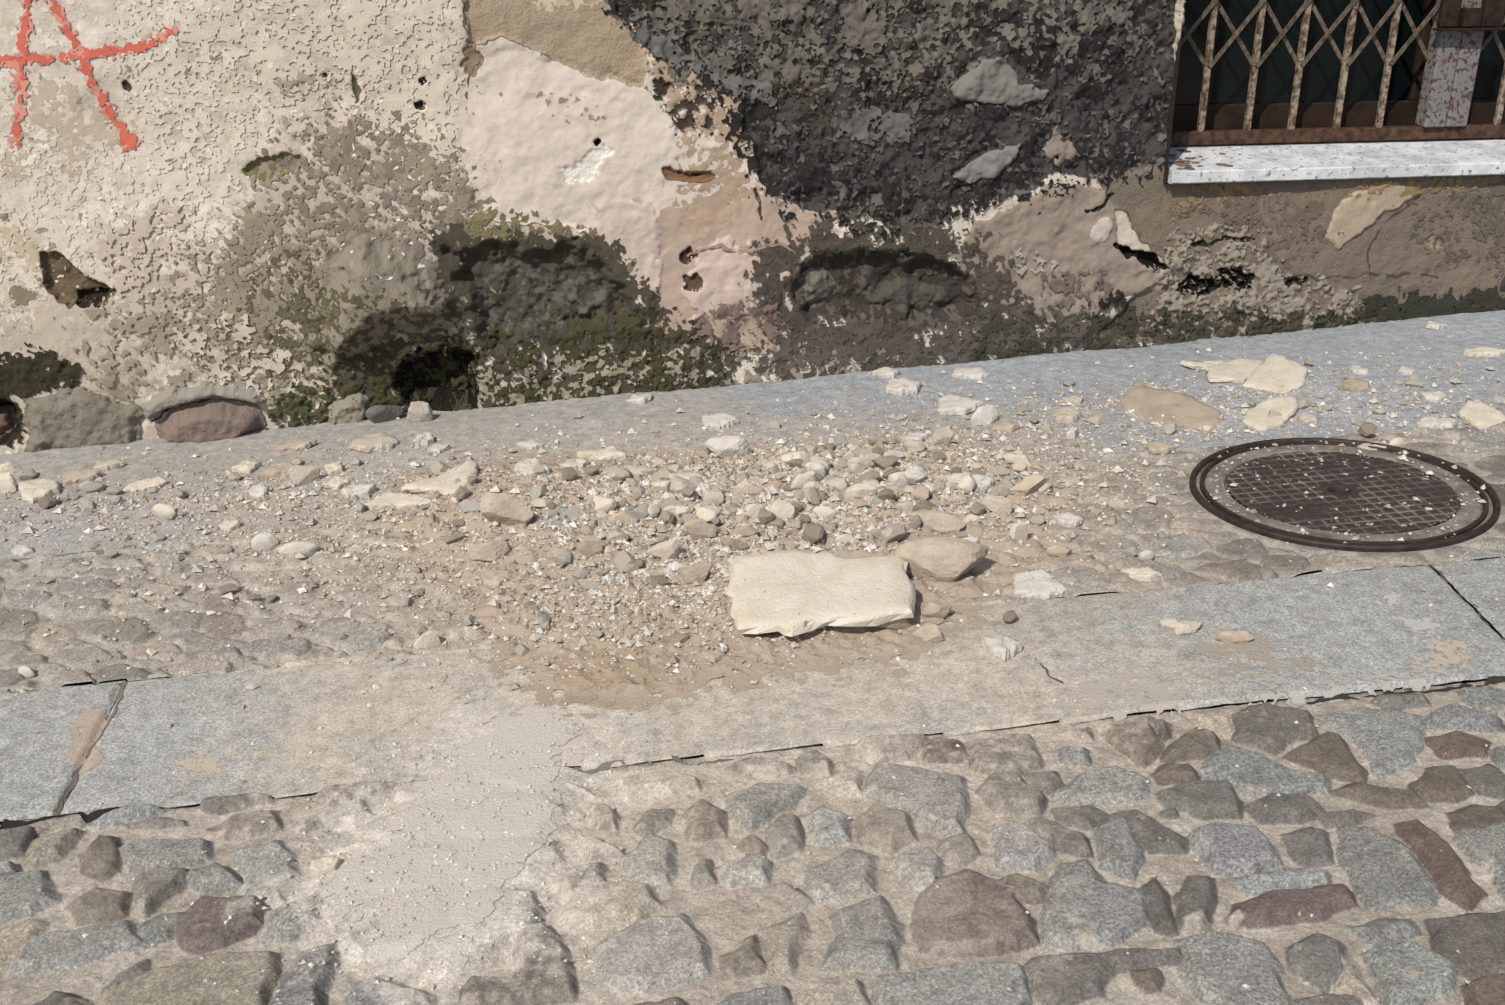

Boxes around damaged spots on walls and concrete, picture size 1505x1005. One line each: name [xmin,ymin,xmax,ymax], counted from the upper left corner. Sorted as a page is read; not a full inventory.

leakage [0,0,1419,455]
peeling [0,0,1505,411]
leakage [1392,175,1505,283]
flaking render [0,303,304,452]
flaking render [328,393,371,425]
crack [1430,565,1505,640]
crack [52,680,127,819]